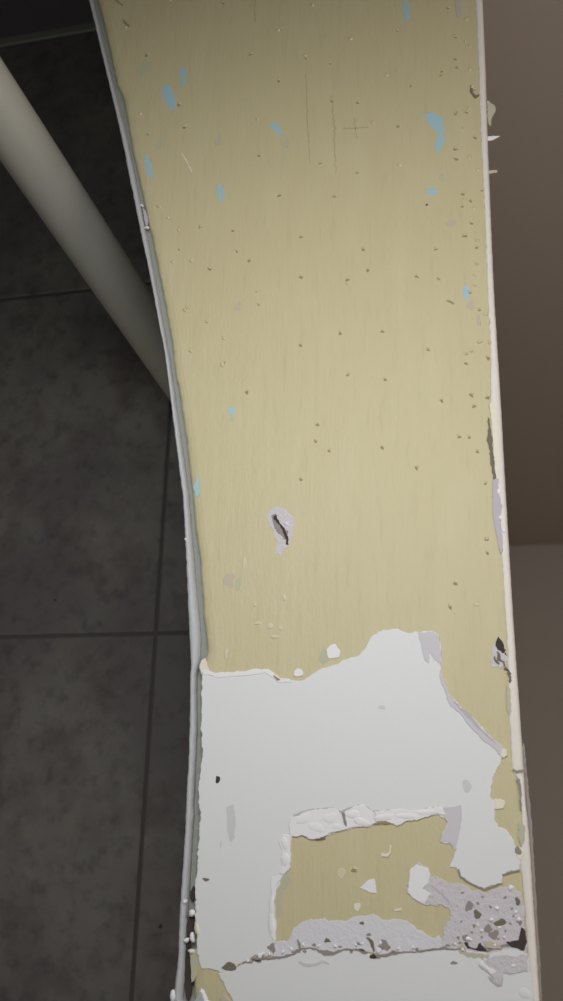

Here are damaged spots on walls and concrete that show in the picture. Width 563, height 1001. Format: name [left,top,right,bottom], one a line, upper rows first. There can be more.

spalling [267,506,295,556]
peeling [194,629,533,1001]